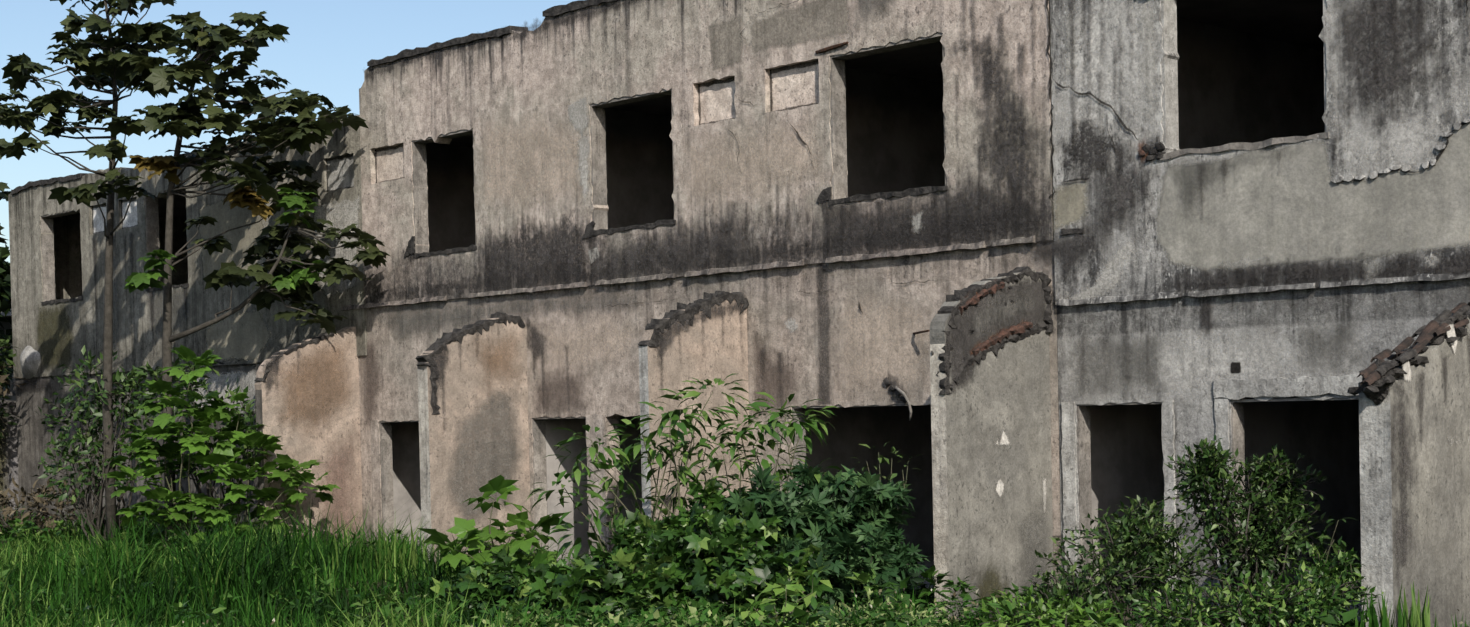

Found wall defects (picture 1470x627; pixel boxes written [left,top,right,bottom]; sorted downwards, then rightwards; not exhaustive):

crack [1046,0,1138,202]
damp [1341,0,1440,120]
damp [369,0,1157,408]
flaking render [1138,118,1470,279]
spalling [429,357,440,414]
spalling [848,241,1134,404]
damp [1176,248,1470,328]
flaking render [1447,318,1470,353]